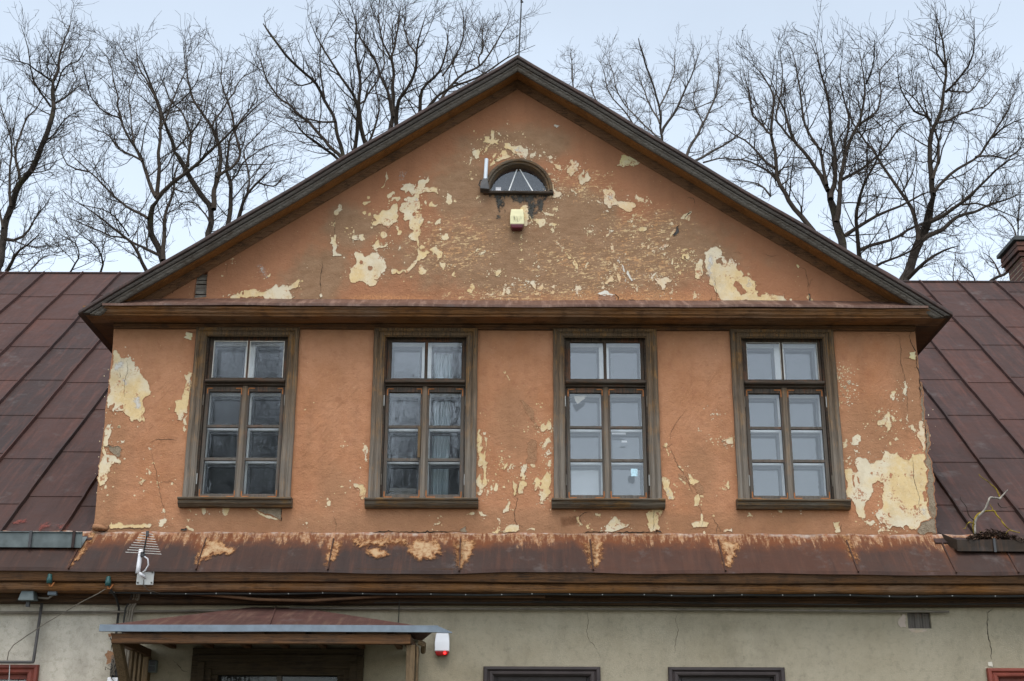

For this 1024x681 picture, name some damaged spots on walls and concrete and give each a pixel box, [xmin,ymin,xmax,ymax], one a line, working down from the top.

peeling [329,123,792,300]
peeling [95,347,230,532]
spalling [373,399,553,534]
peeling [843,380,937,535]
corrosion [195,538,235,564]
corrosion [324,538,442,565]
corrosion [453,539,475,568]
corrosion [583,541,603,568]
corrosion [719,540,739,567]